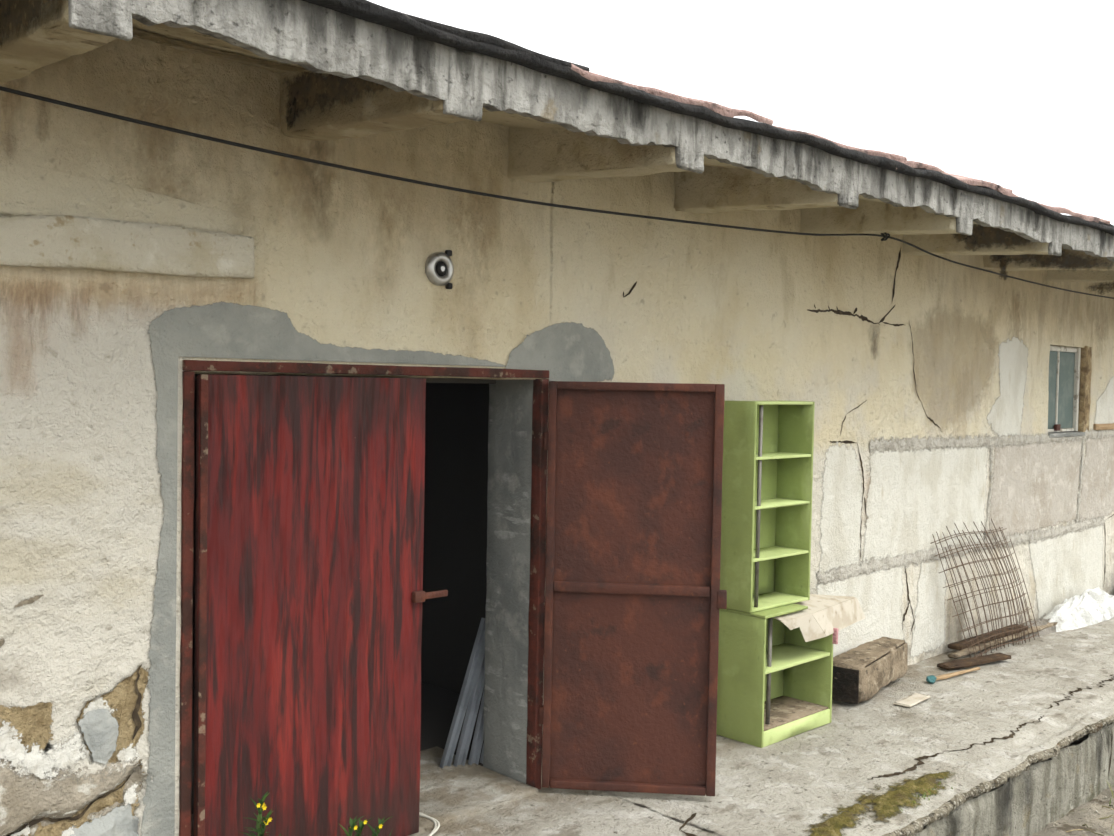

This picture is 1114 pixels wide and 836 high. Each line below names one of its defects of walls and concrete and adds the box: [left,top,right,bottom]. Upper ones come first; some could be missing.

crack [808,249,943,432]
flaking render [817,336,1114,660]
peeling [0,664,149,836]